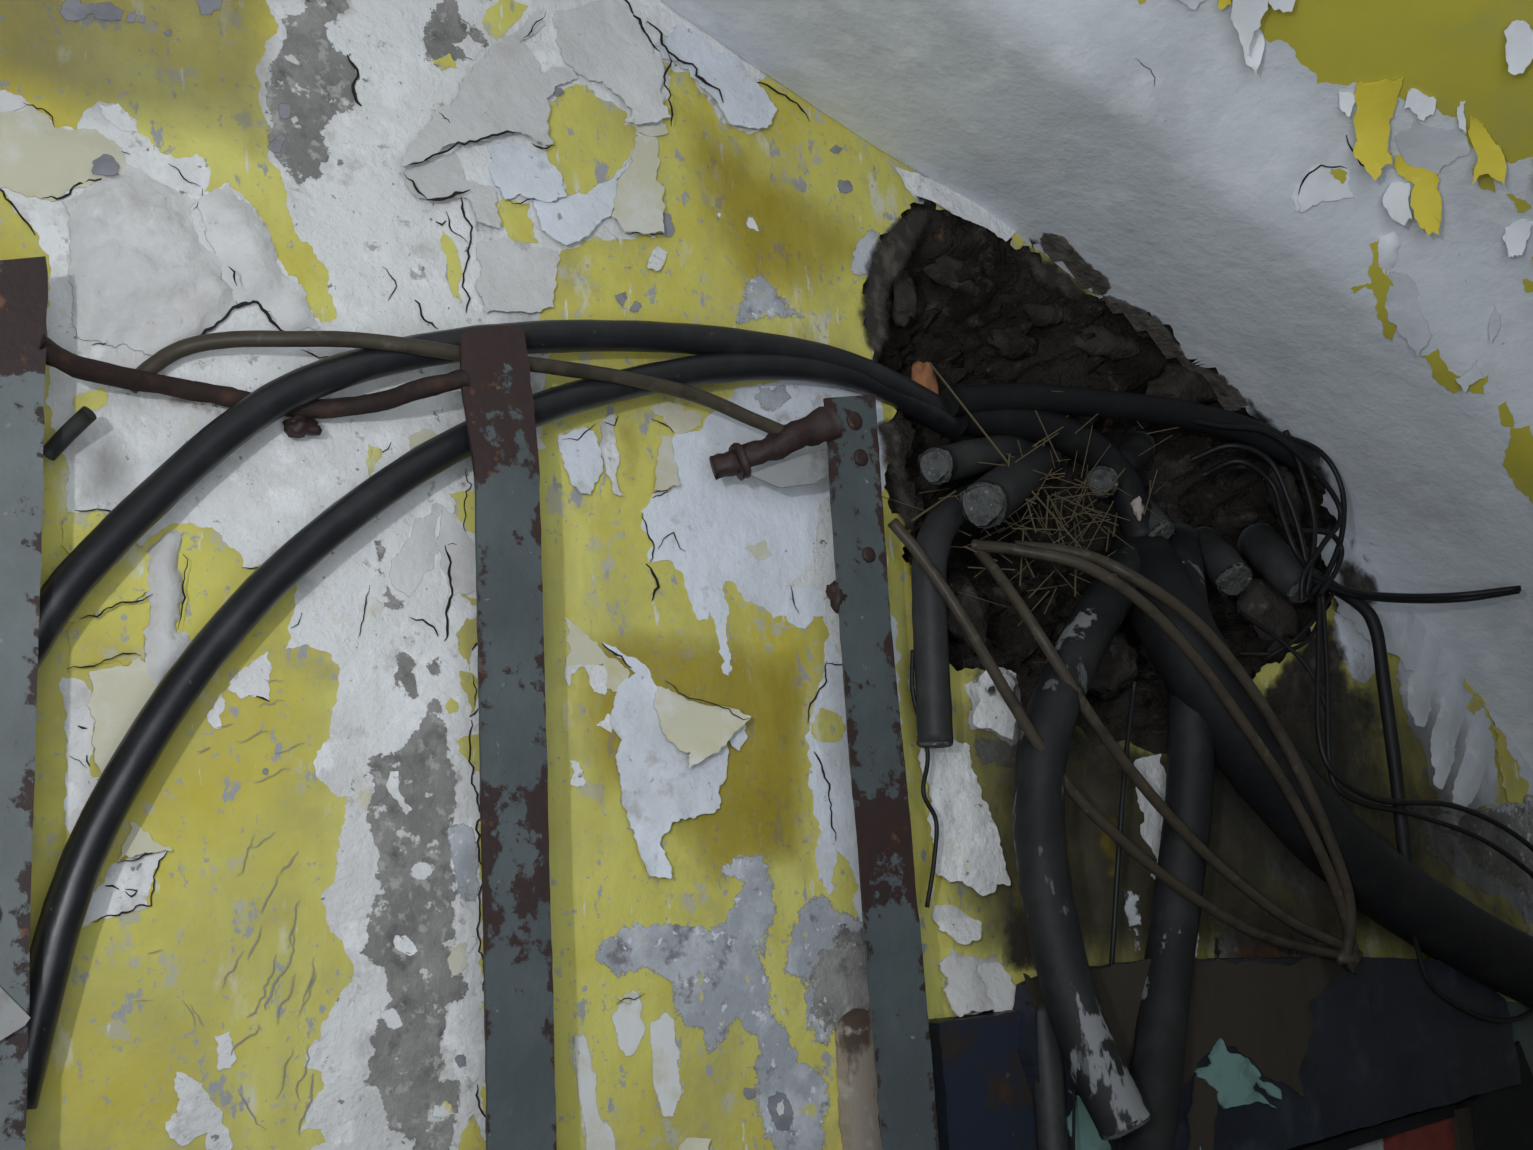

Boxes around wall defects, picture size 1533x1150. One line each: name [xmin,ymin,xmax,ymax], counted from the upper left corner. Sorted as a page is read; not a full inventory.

peeling [0,0,809,394]
spalling [851,165,1271,426]
peeling [1290,77,1533,394]
peeling [1504,20,1533,75]
peeling [82,822,172,928]
peeling [45,362,466,834]
peeling [207,456,486,1150]
peeling [536,414,625,497]
peeling [563,618,751,879]
peeling [596,380,986,1150]
spalling [890,401,1533,937]
peeling [165,1072,233,1150]